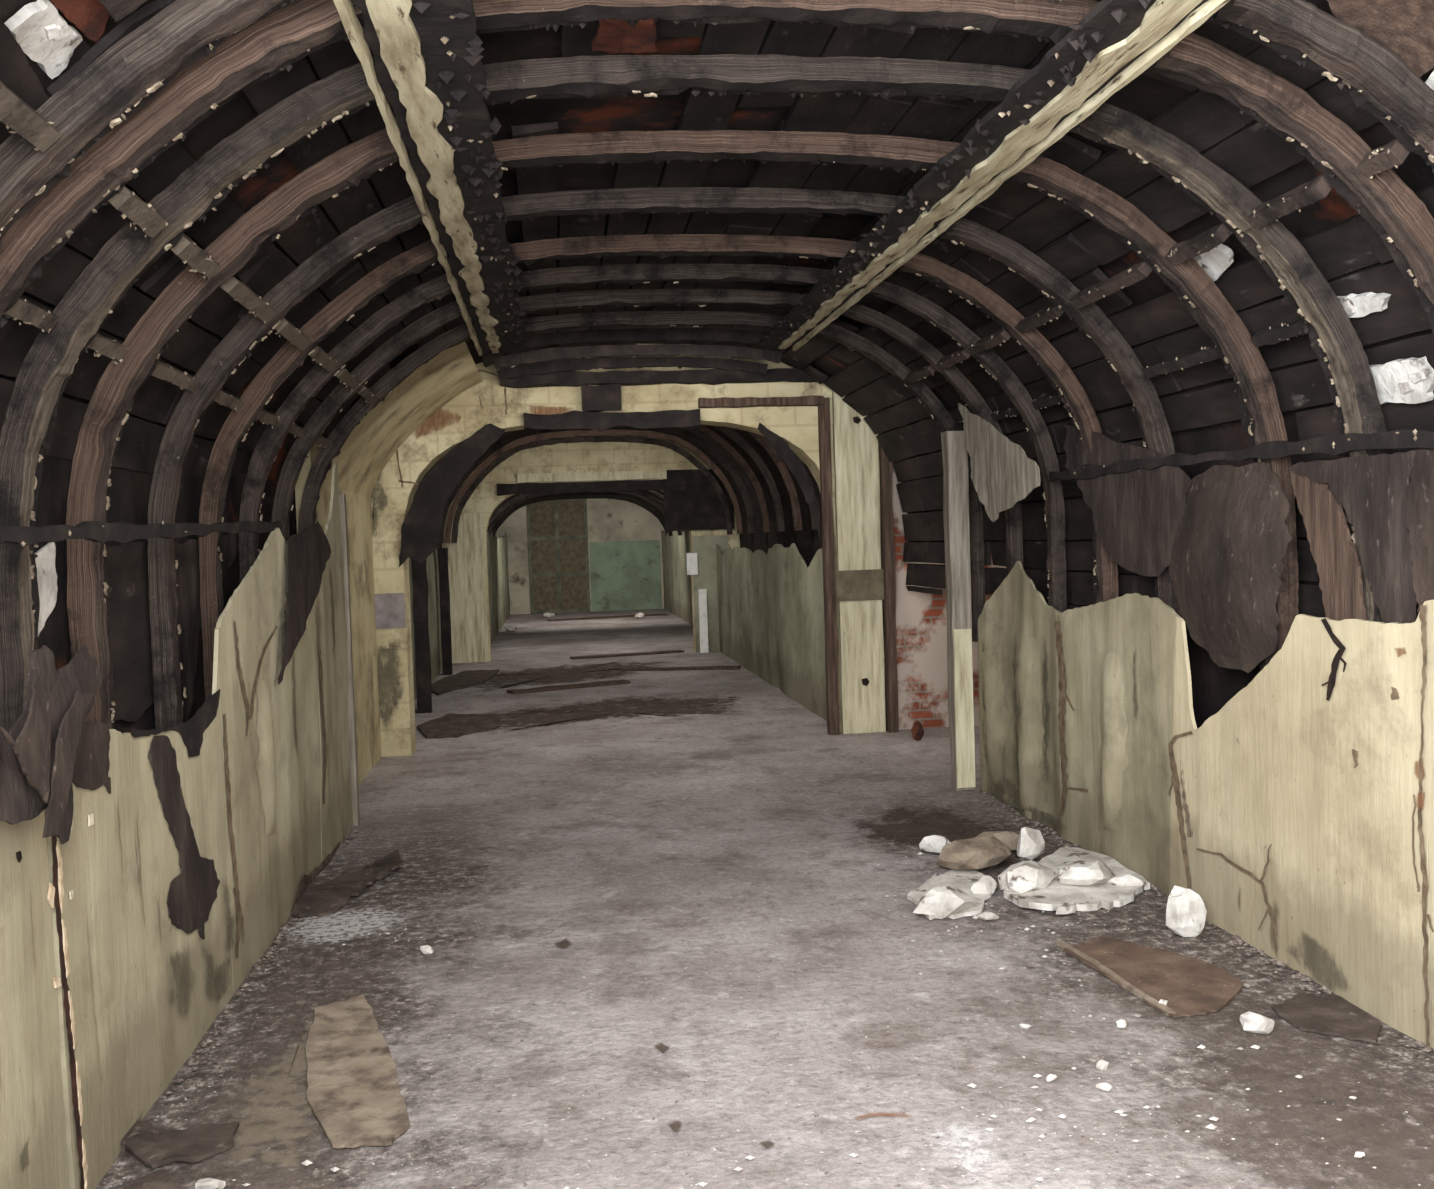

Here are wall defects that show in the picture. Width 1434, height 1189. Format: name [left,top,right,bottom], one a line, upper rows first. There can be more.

flaking render [4,0,83,79]
flaking render [34,542,58,636]
crack [1321,618,1346,700]
spalling [72,721,111,794]
spalling [129,689,220,940]